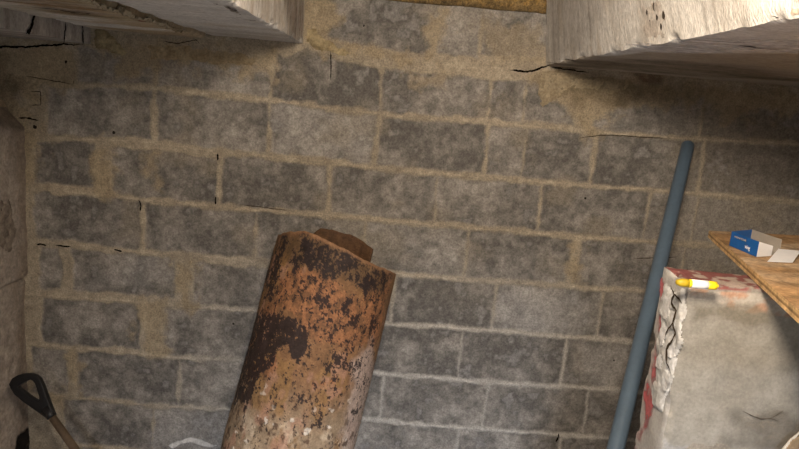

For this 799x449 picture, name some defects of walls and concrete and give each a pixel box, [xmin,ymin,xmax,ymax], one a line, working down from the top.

crack [0,8,90,49]
crack [512,65,589,73]
crack [665,285,682,371]